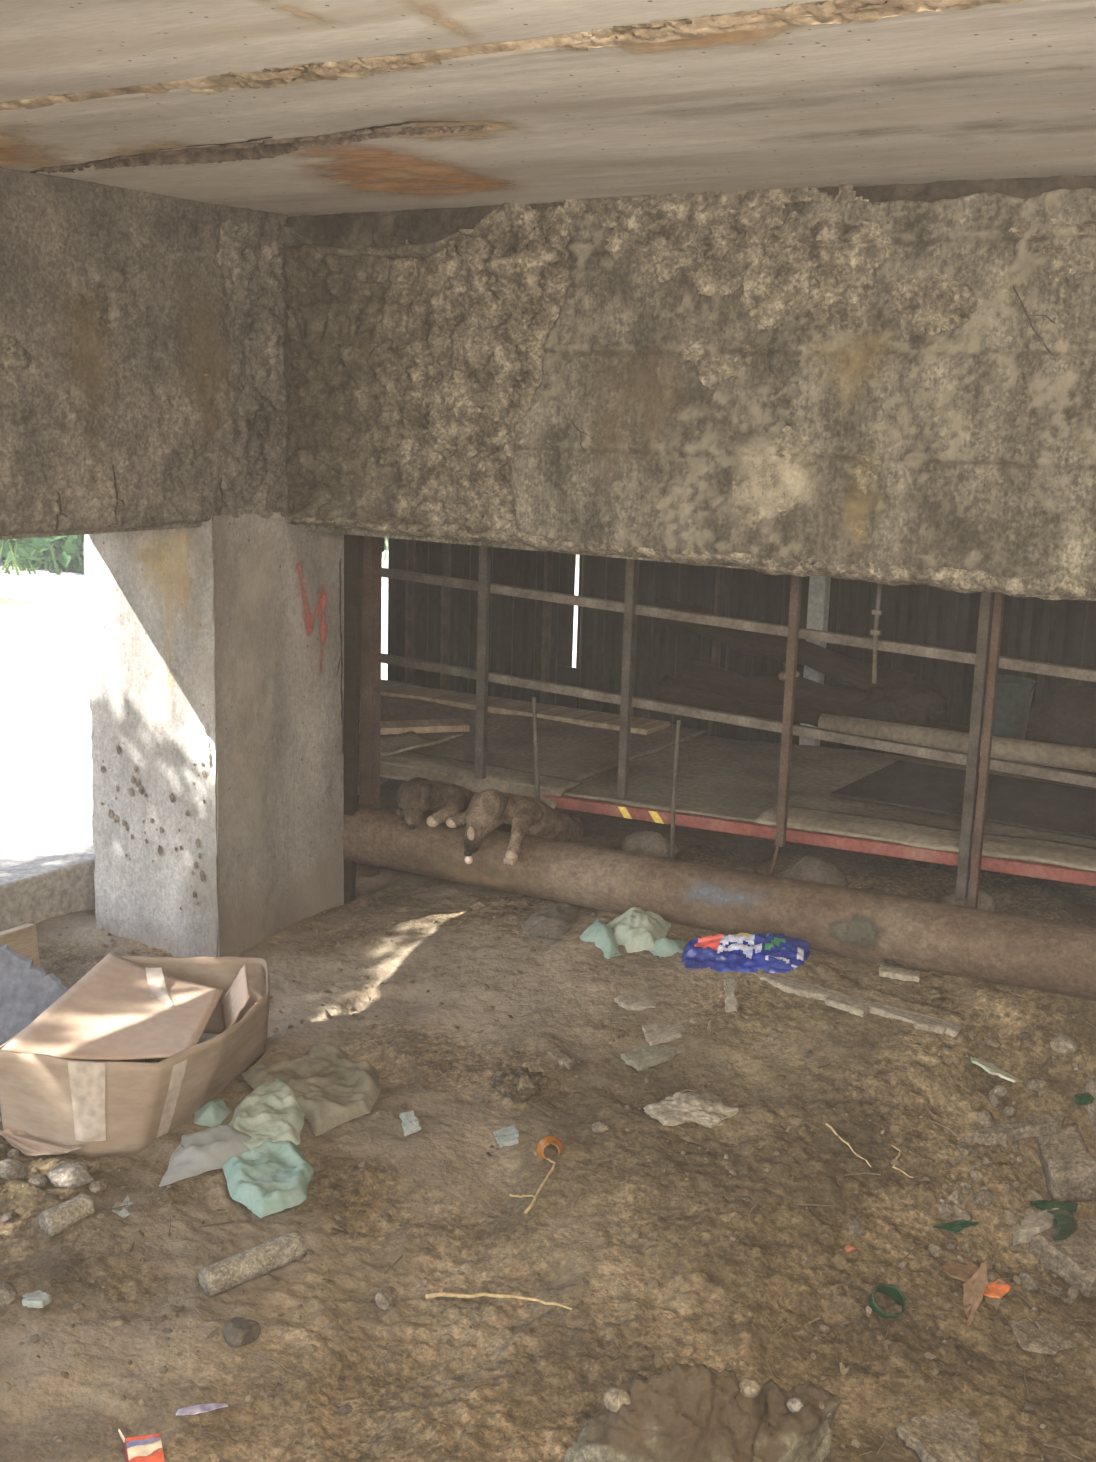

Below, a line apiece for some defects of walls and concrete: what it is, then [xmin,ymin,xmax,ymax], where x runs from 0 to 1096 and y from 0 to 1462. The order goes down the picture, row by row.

rust [304,121,513,196]
spalling [217,184,1096,601]